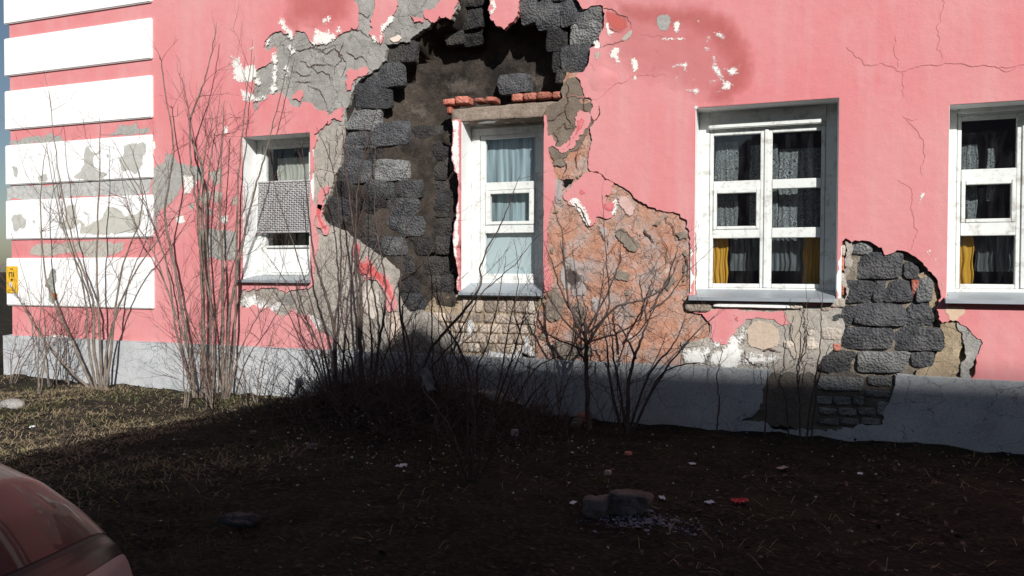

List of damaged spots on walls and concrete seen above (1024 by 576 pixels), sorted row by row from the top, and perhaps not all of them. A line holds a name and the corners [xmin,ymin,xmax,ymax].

peeling [7,123,237,304]
spalling [231,0,982,431]
crack [847,1,1024,245]